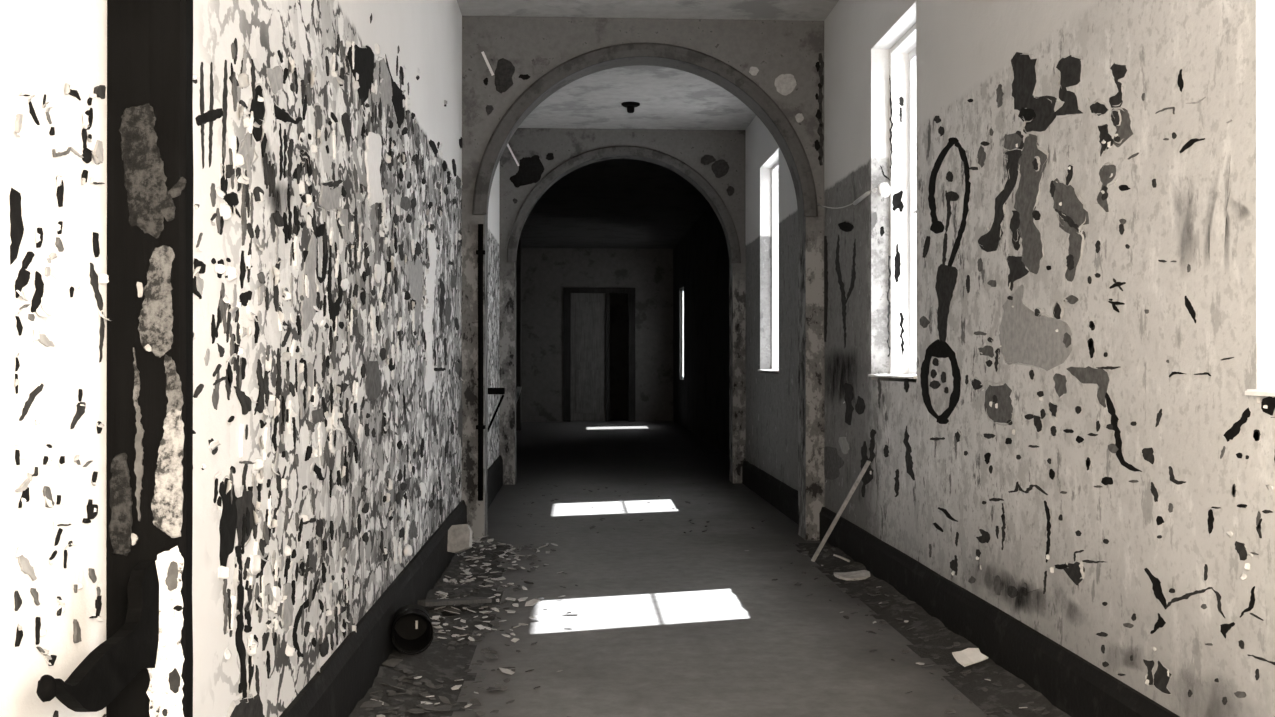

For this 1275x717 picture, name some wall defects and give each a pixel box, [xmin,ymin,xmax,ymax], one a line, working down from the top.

peeling [14,83,106,185]
peeling [14,175,64,425]
peeling [69,232,111,363]
flaking render [965,52,1133,474]
flaking render [193,34,463,717]
crack [1067,366,1186,502]
crack [1169,357,1234,377]
crack [1220,407,1251,459]
peeling [15,439,98,569]
crack [1207,506,1220,534]
crack [1255,518,1263,539]
crack [1144,564,1275,665]